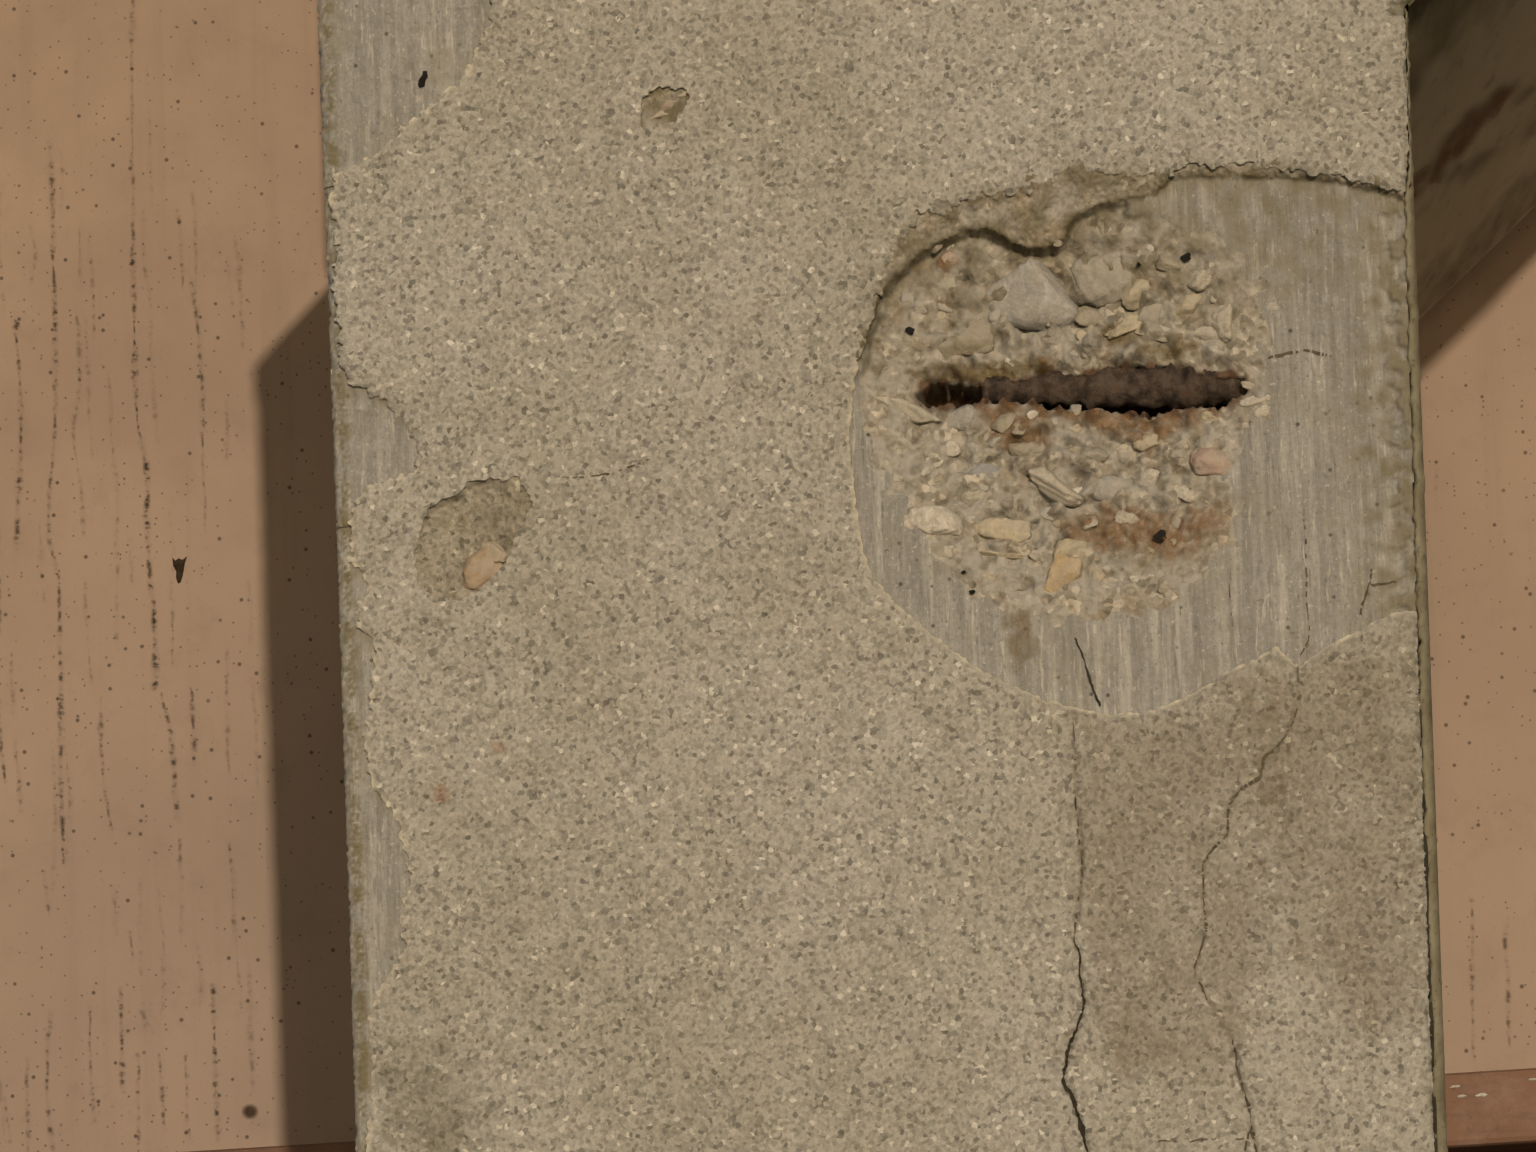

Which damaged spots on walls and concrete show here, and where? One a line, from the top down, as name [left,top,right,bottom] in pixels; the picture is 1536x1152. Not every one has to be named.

peeling [317,0,492,190]
spalling [641,87,690,128]
peeling [330,373,419,529]
spalling [414,477,533,601]
rust [987,404,1045,449]
spalling [849,157,1417,715]
peeling [337,552,415,1152]
crack [1061,638,1101,1152]
crack [1194,519,1310,1000]
crack [1158,1040,1258,1152]